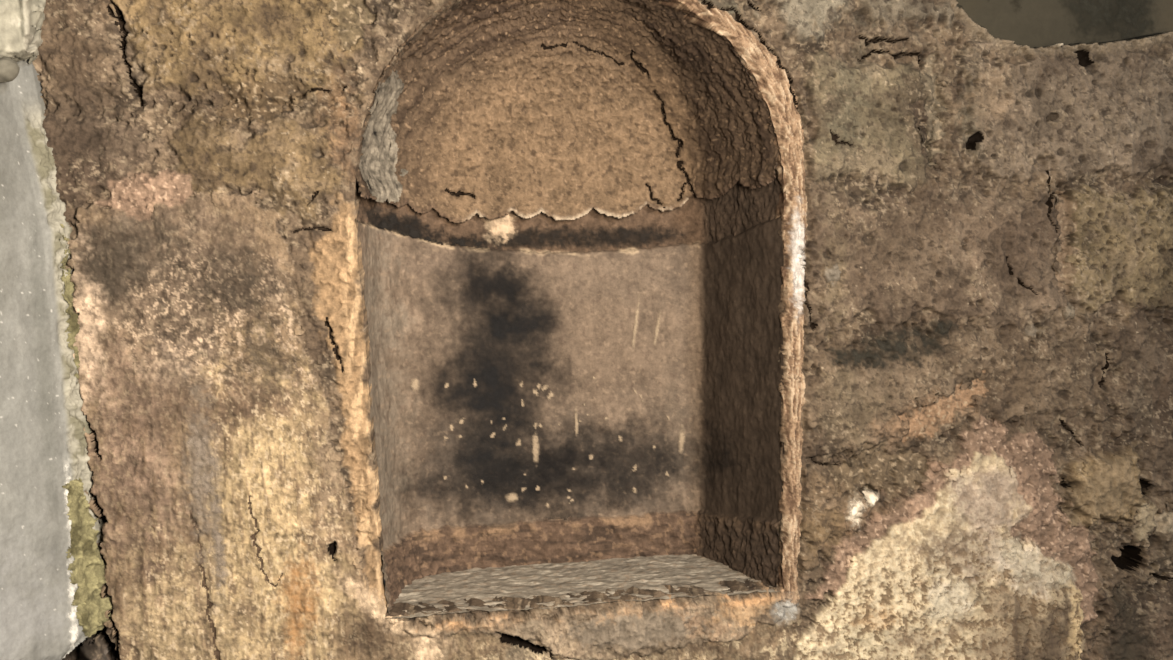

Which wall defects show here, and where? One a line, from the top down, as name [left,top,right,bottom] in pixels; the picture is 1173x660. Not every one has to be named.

damp [450,236,490,250]
damp [475,268,527,305]
crack [83,414,102,457]
peeling [65,168,1099,660]
damp [549,433,676,501]
crack [88,491,120,660]